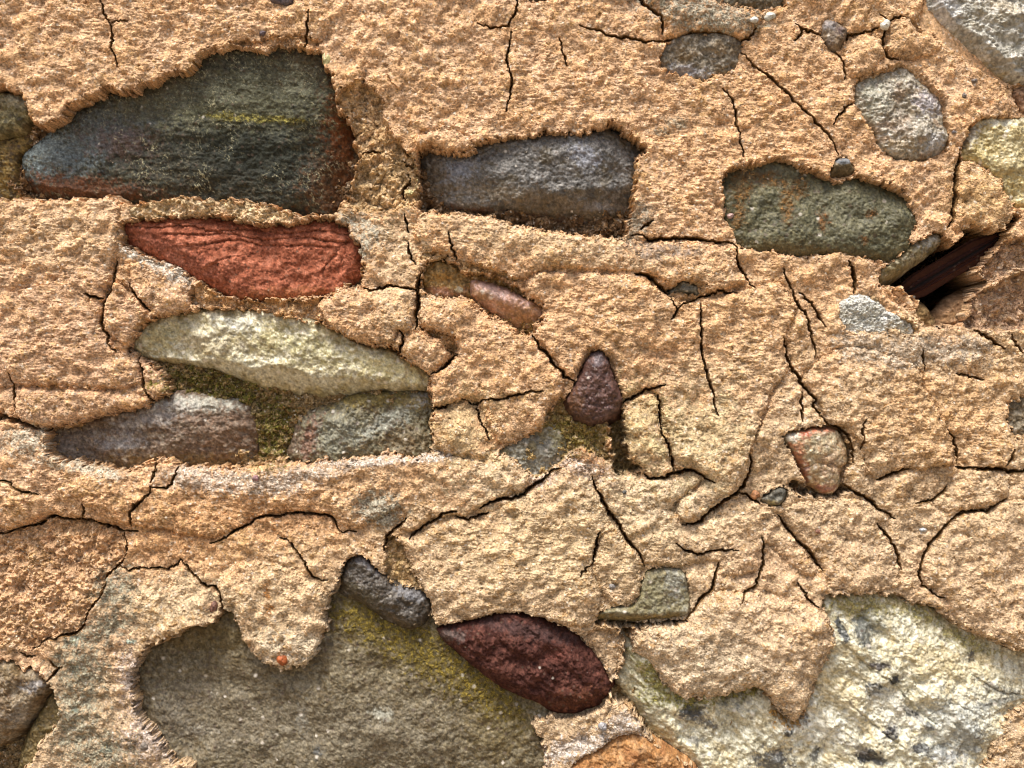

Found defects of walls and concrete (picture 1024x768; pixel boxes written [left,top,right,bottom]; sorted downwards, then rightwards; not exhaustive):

crack [559,0,854,157]
spalling [128,196,294,224]
peeling [103,261,457,372]
crack [631,220,755,416]
spalling [959,235,1024,333]
peeling [143,360,167,400]
crack [783,268,1024,598]
crack [0,462,223,683]
crack [383,468,560,551]
crack [580,477,645,577]
crack [623,385,823,619]
peeling [586,628,623,677]